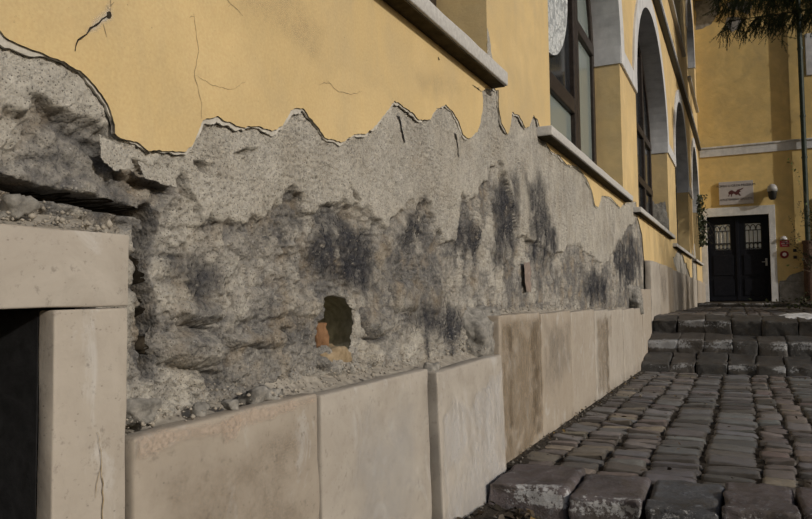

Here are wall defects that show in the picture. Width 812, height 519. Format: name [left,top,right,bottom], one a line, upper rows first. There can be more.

crack [75,0,114,51]
crack [194,17,245,117]
spalling [0,34,645,418]
leakage [308,221,371,287]
leakage [455,223,481,254]
leakage [494,178,519,259]
leakage [529,176,557,258]
leakage [614,239,640,293]
leakage [413,308,461,357]